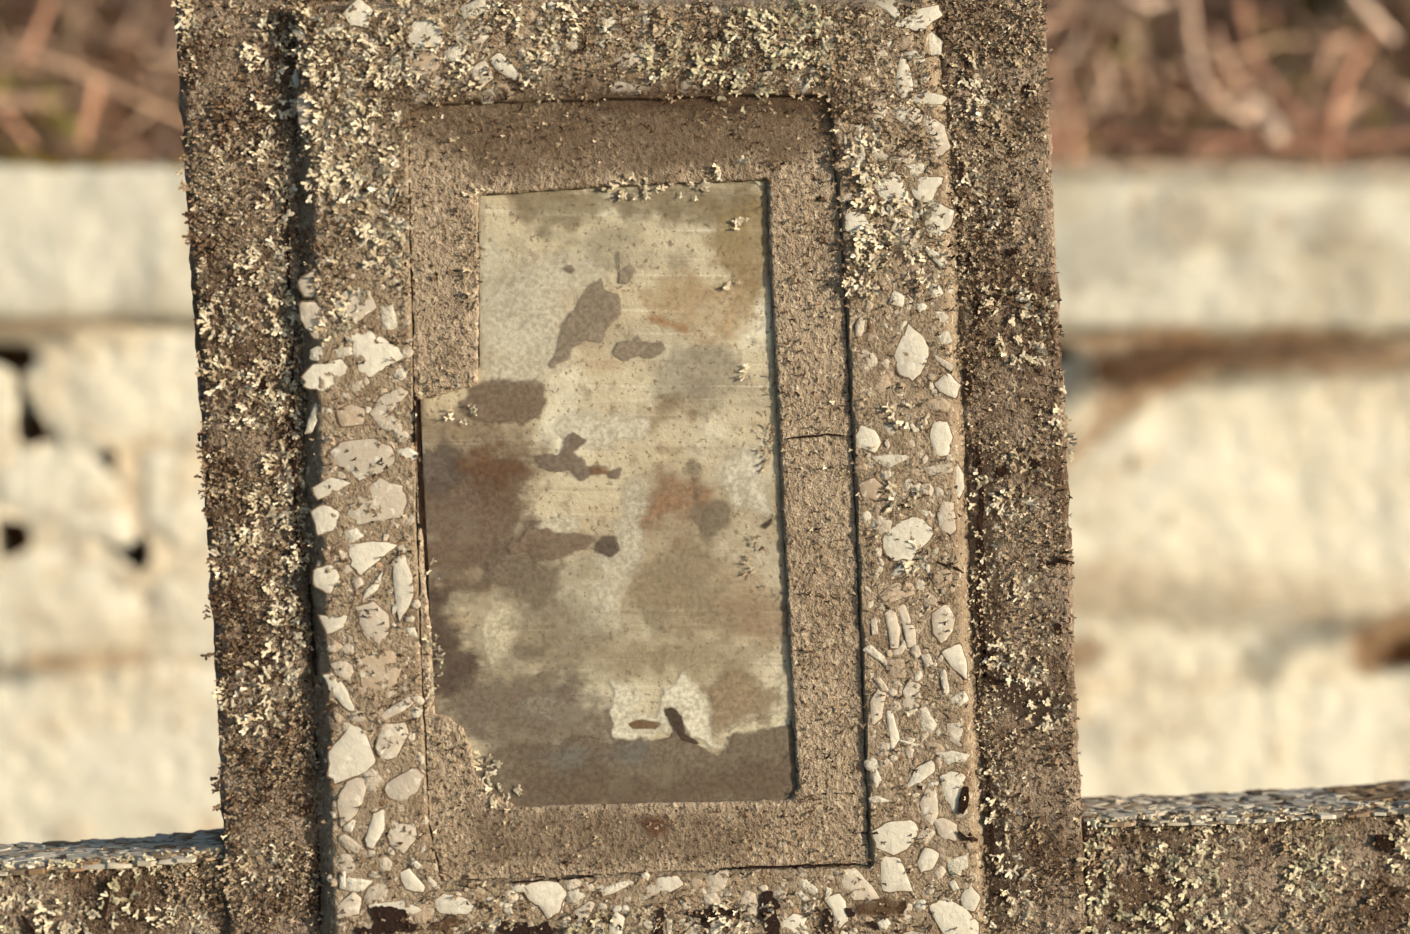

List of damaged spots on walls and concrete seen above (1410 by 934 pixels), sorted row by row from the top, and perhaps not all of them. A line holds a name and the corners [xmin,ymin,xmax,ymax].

damp [402,75,838,172]
damp [482,257,597,382]
damp [509,182,769,448]
damp [423,418,793,755]